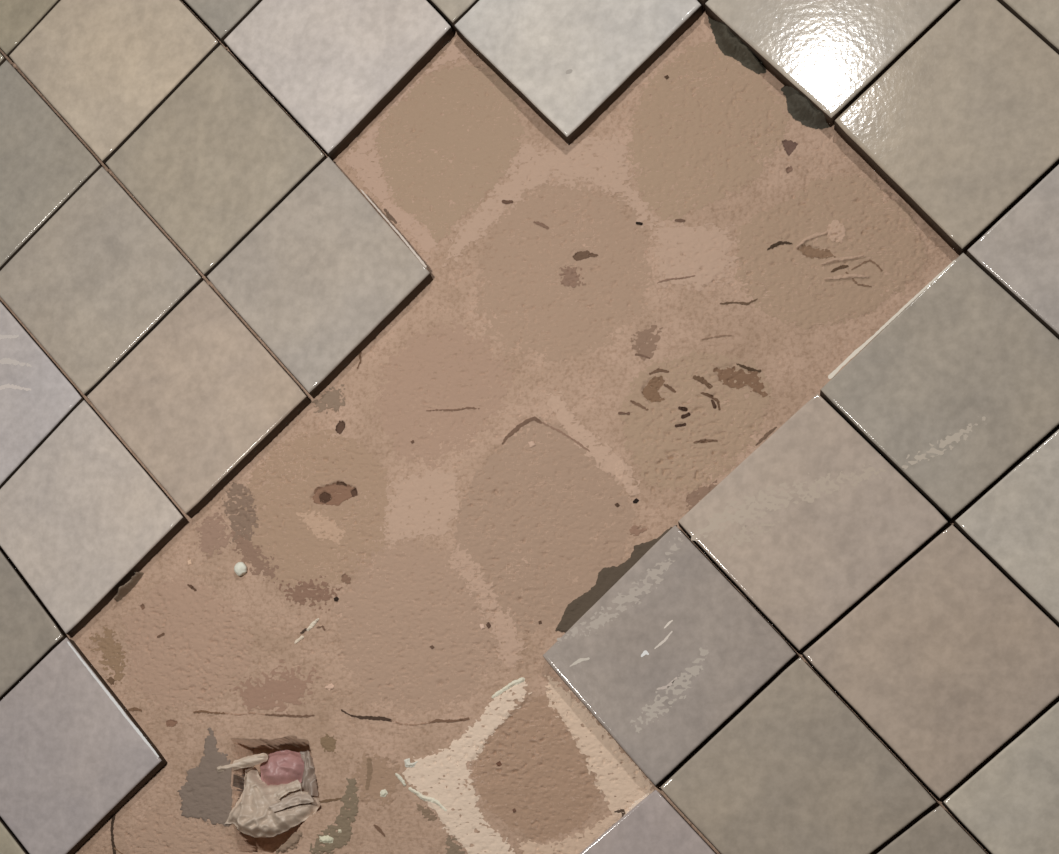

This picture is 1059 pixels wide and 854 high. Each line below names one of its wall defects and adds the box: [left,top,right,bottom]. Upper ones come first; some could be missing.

spalling [782,139,798,173]
peeling [360,189,427,268]
hole [559,250,598,291]
spalling [797,244,836,259]
peeling [828,260,956,379]
spalling [630,321,676,410]
spalling [693,366,770,410]
hole [313,481,358,506]
peeling [67,641,159,757]
spalling [395,758,418,786]